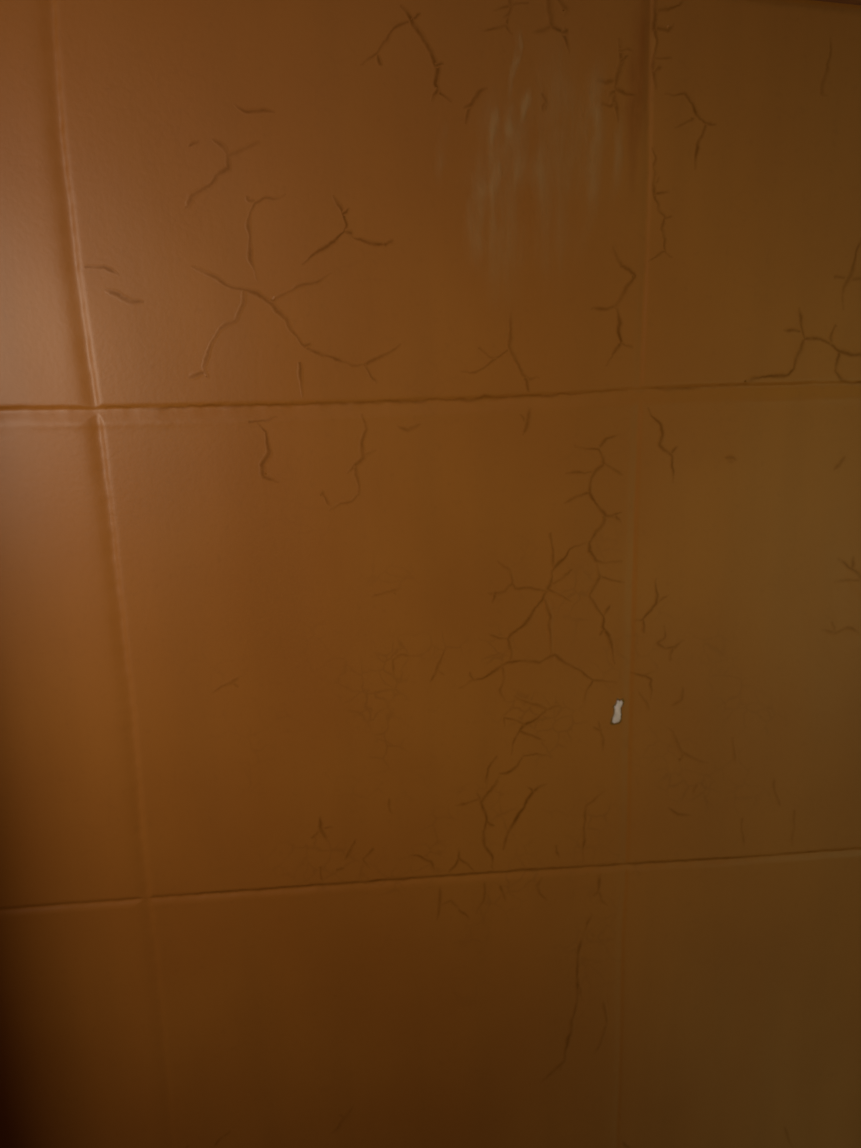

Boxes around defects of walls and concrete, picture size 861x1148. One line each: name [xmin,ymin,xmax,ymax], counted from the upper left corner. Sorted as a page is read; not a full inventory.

crack [359,4,452,104]
crack [301,195,395,266]
crack [719,307,861,388]
crack [104,388,679,484]
peeling [610,698,625,725]